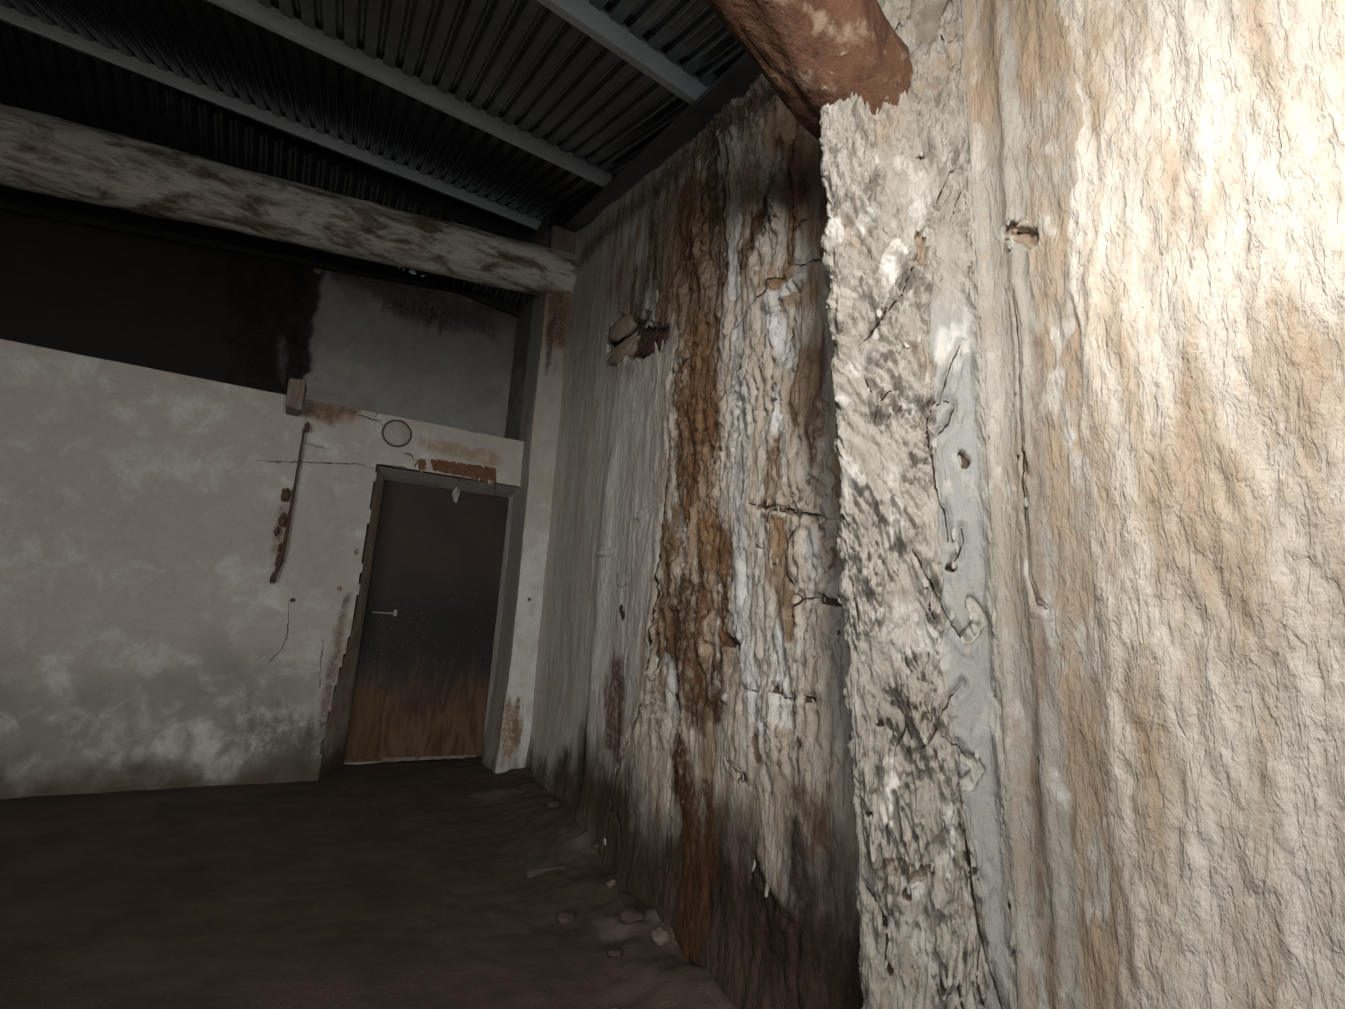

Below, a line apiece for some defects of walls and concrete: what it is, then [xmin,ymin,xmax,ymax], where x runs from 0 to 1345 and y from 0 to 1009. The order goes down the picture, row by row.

spalling [914,224,927,272]
spalling [1005,220,1039,249]
spalling [608,279,669,367]
spalling [904,335,935,384]
crack [257,412,417,468]
crack [716,164,838,742]
spalling [958,452,970,469]
rust [650,145,806,961]
rust [500,699,521,757]
spalling [958,749,985,792]
leakage [721,788,861,1009]
spalling [883,855,934,901]